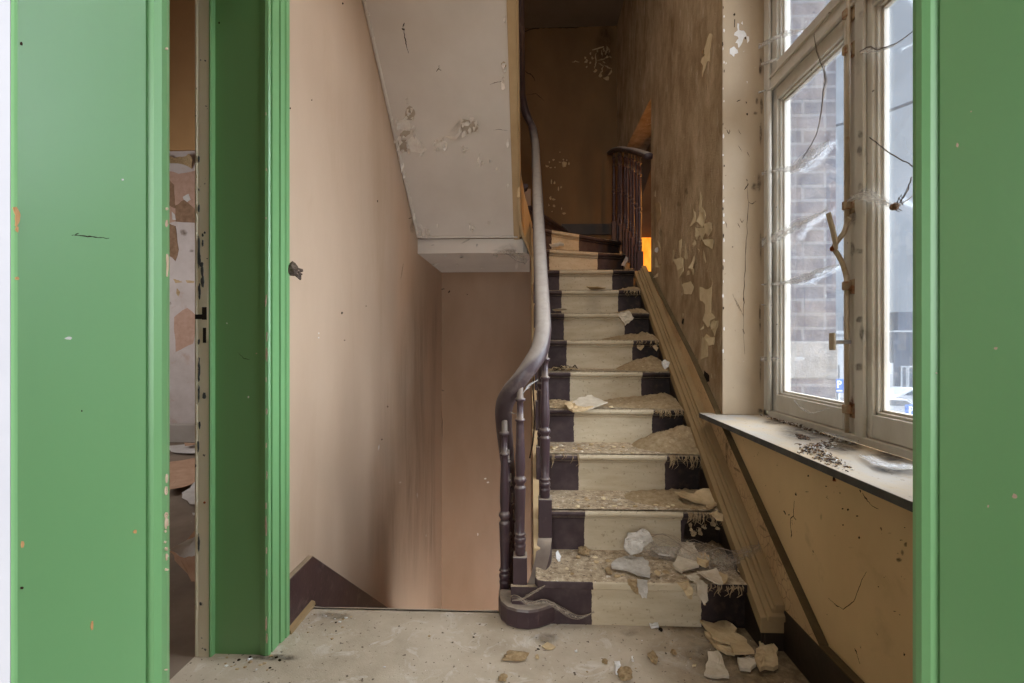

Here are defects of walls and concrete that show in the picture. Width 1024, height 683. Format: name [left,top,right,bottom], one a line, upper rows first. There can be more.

flaking render [730,13,749,57]
peeling [165,154,208,299]
peeling [174,308,200,352]
peeling [650,190,718,382]